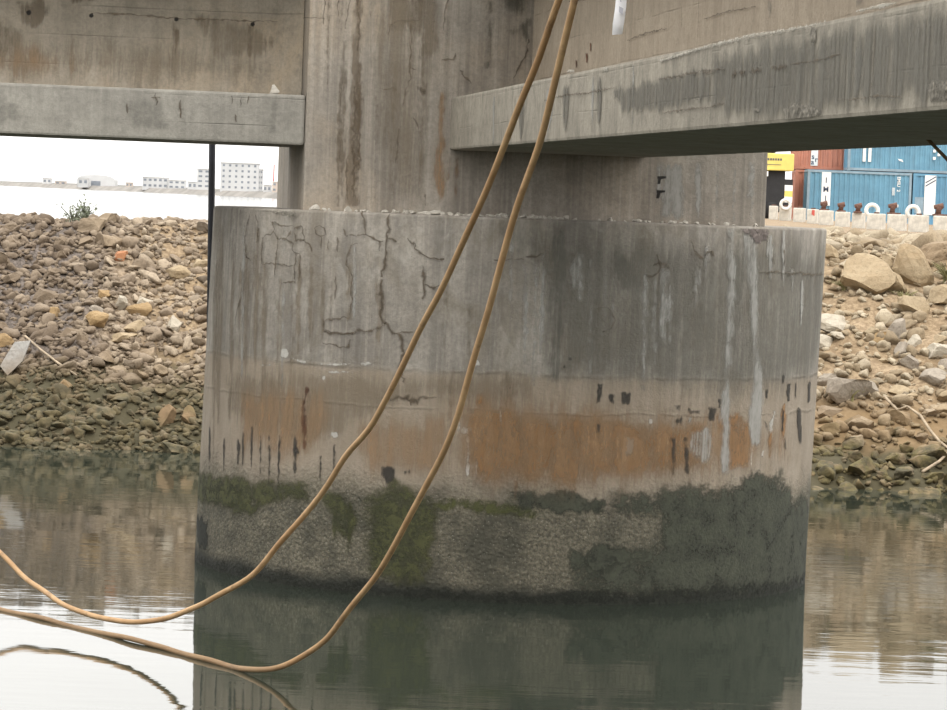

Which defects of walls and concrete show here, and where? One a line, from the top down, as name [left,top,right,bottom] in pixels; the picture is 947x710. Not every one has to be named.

crack [314,0,361,51]
leakage [337,0,361,205]
leakage [614,16,947,114]
crack [235,86,444,405]
leakage [237,427,281,483]
leakage [381,466,410,483]
rust [469,395,702,483]
rust [718,414,750,467]